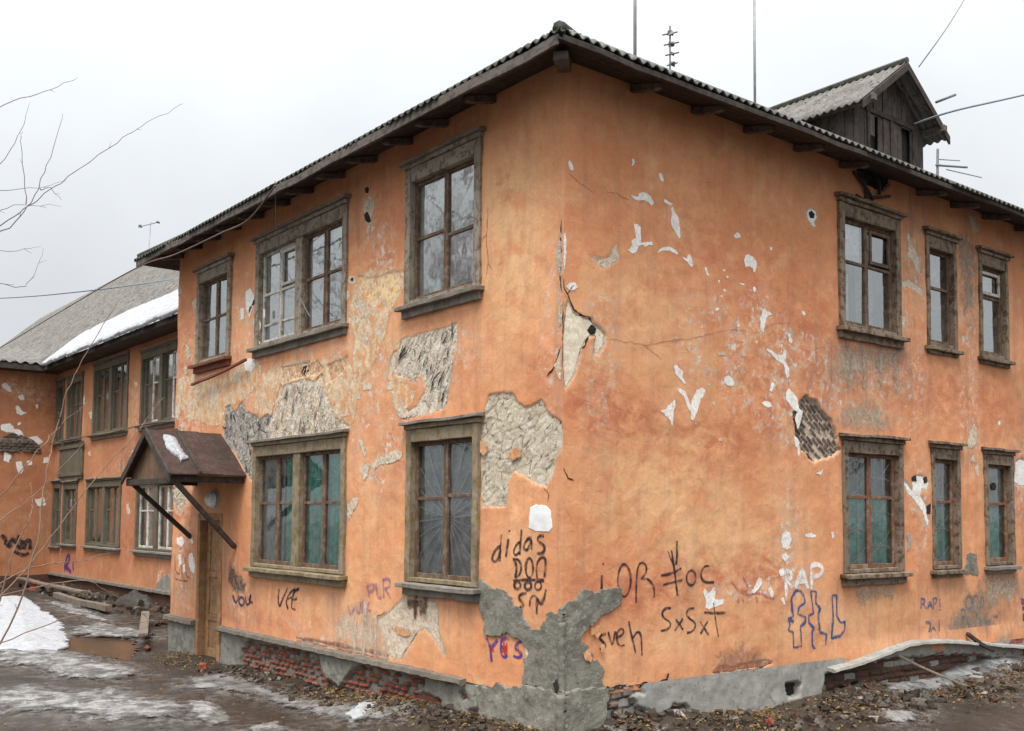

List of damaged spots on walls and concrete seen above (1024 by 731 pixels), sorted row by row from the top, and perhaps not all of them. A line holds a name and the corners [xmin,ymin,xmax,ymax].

flaking render [0,383,49,474]
peeling [175,267,458,480]
flaking render [480,393,563,507]
flaking render [556,232,578,290]
flaking render [554,302,604,386]
peeling [592,192,728,311]
crack [547,219,784,378]
peeling [661,365,716,426]
peeling [744,254,757,272]
flaking render [767,333,836,475]
peeling [904,475,931,525]
spalling [243,596,445,704]